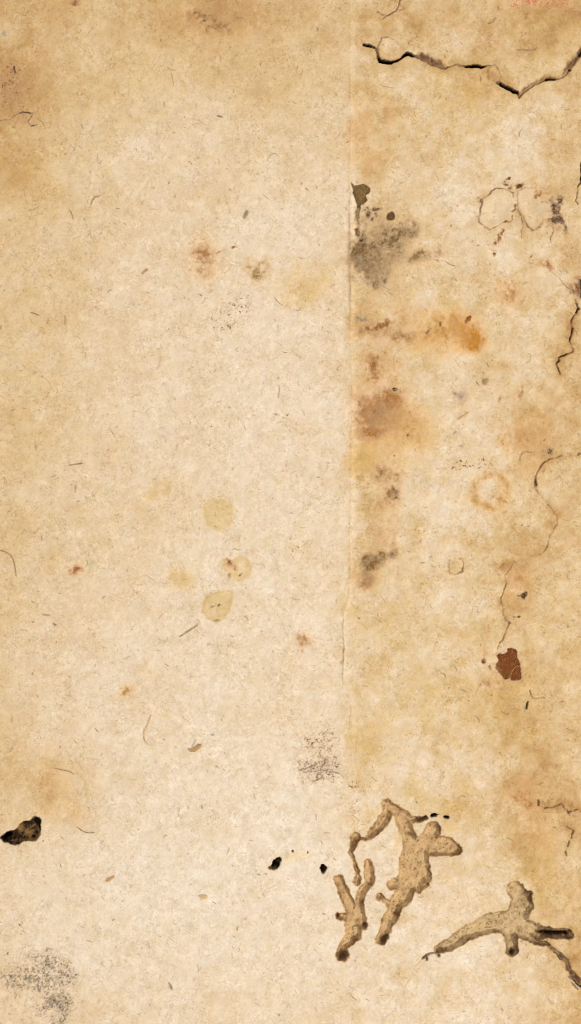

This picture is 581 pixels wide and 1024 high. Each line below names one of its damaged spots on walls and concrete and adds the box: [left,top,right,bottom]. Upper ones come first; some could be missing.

crack [361,0,581,99]
damp [349,210,441,290]
corrosion [414,312,486,353]
crack [555,278,581,374]
damp [350,317,426,509]
crack [534,453,581,548]
corrosion [480,648,522,690]